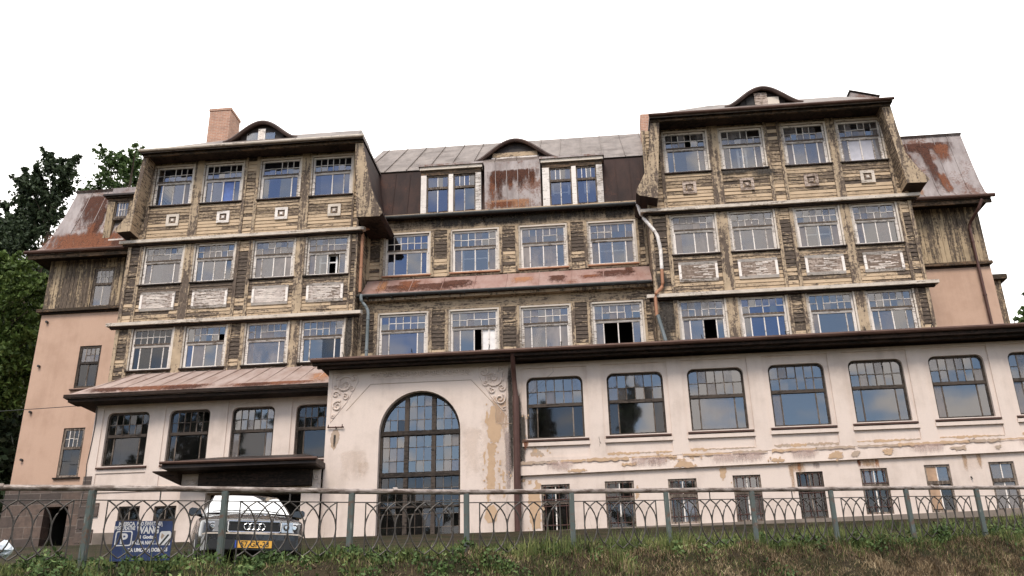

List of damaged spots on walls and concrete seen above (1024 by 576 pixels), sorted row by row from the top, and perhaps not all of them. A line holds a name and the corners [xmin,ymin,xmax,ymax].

corrosion [903,142,954,192]
corrosion [488,168,537,208]
corrosion [44,196,126,250]
peeling [868,254,898,269]
corrosion [581,267,634,278]
peeling [144,294,169,308]
peeling [195,292,222,305]
peeling [255,289,285,302]
peeling [311,285,340,298]
corrosion [378,279,472,292]
peeling [520,432,1024,484]
peeling [483,403,545,530]